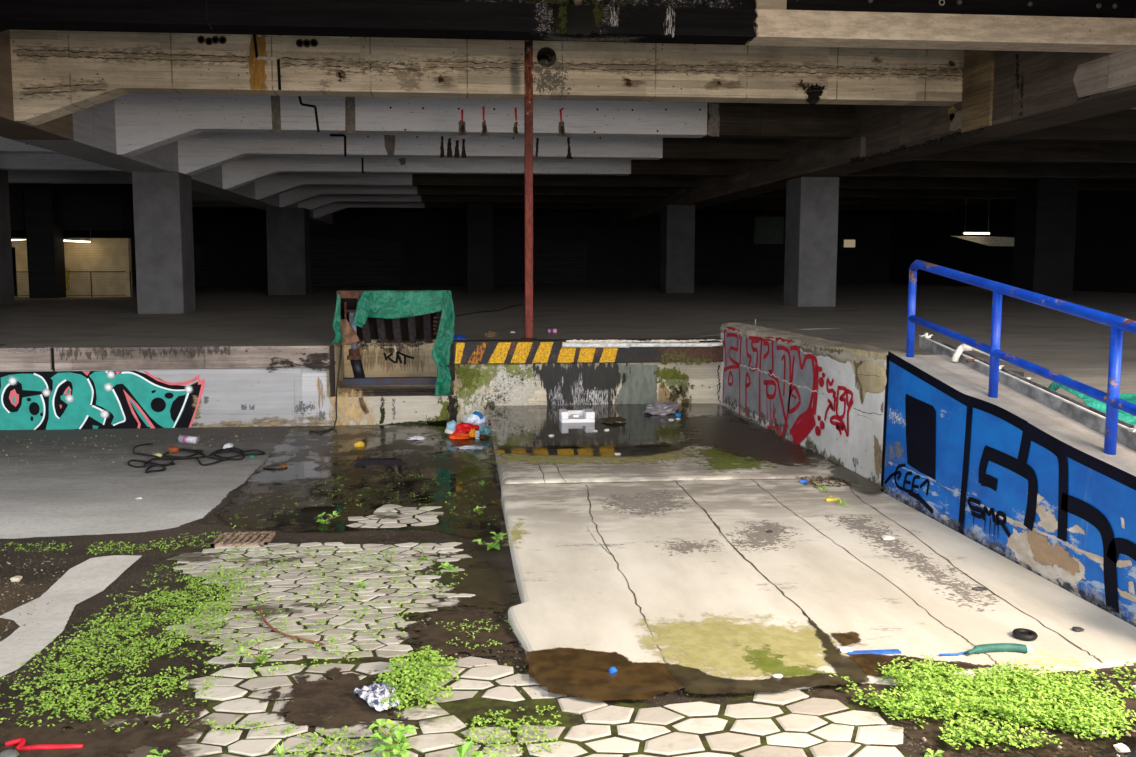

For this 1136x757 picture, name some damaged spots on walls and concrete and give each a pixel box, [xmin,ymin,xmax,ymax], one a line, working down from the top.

leakage [487,0,741,43]
rust [249,35,268,91]
leakage [461,363,631,421]
spalling [815,346,887,404]
peeling [874,435,904,477]
crack [538,460,818,663]
peeling [972,493,1132,599]
peeling [1117,581,1136,623]